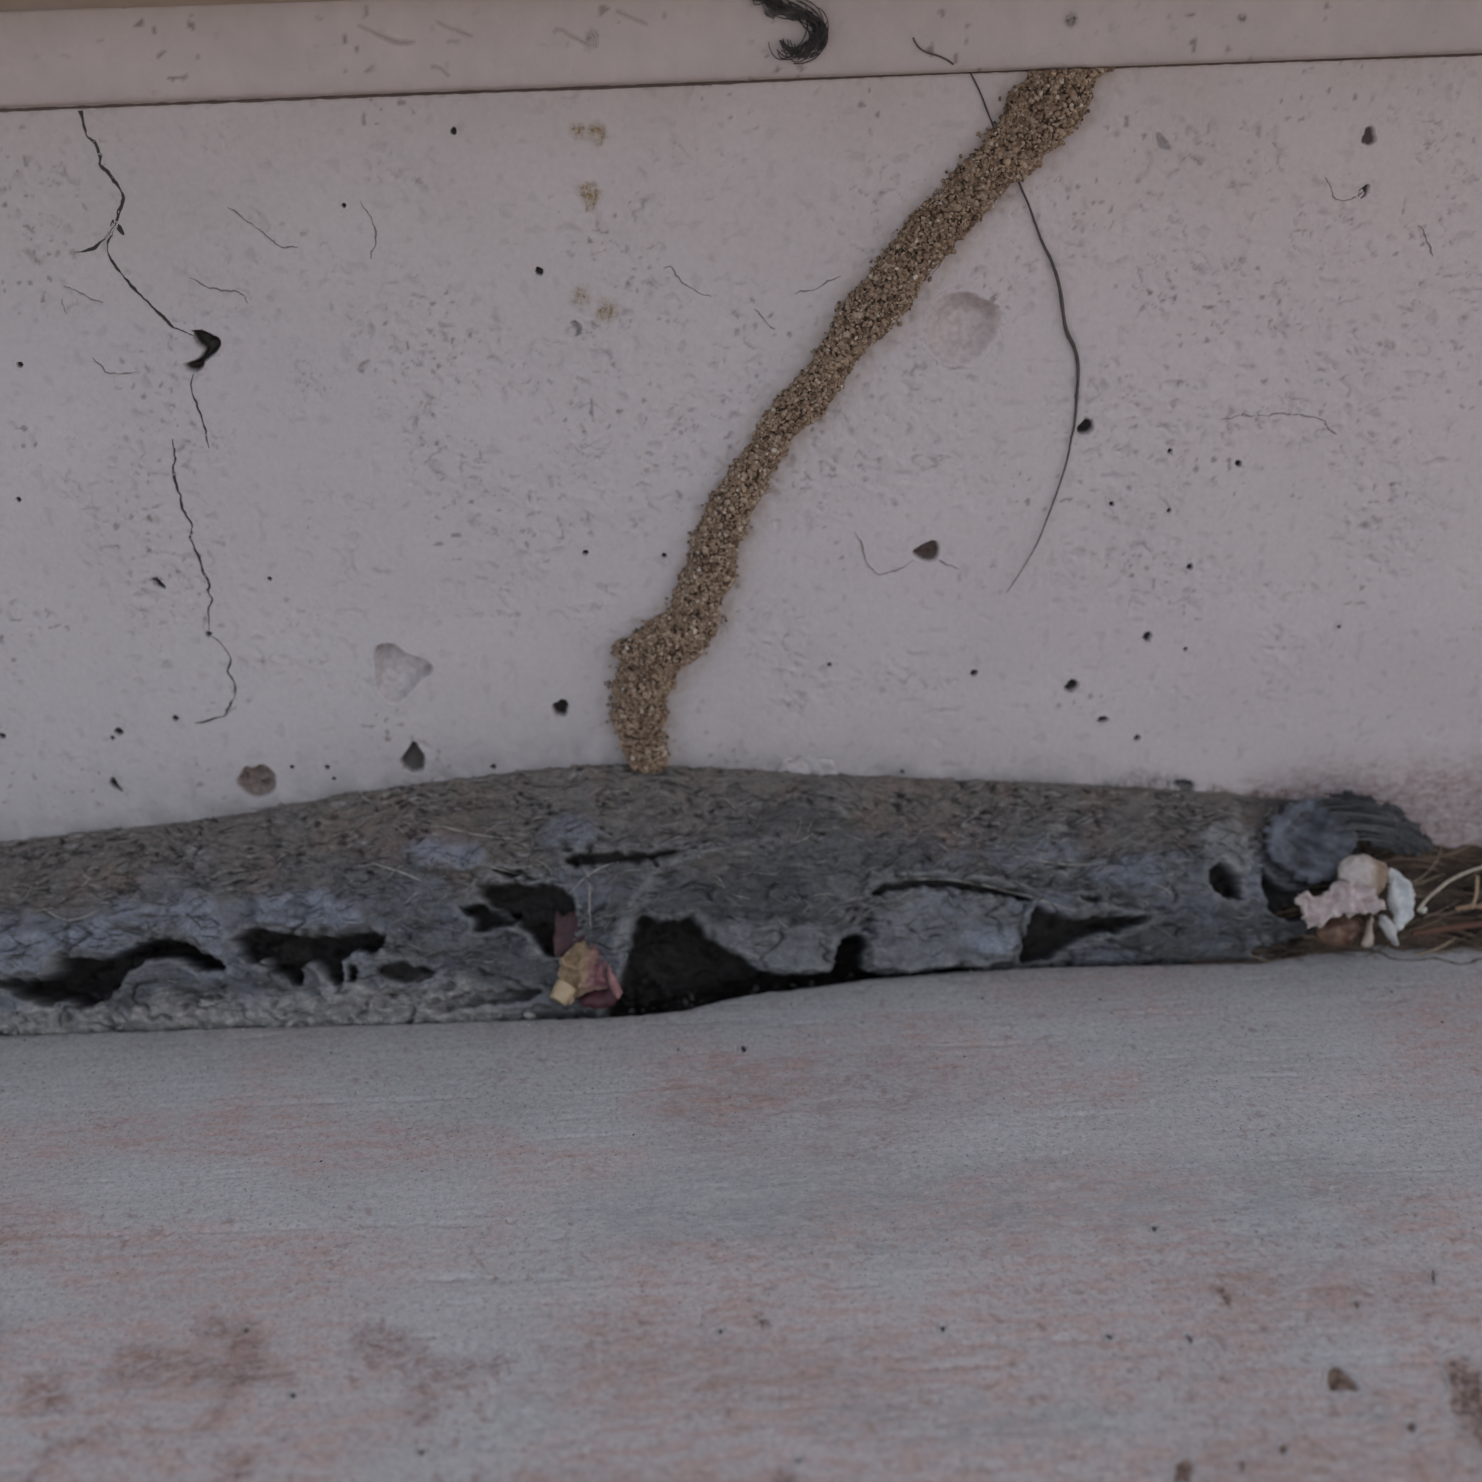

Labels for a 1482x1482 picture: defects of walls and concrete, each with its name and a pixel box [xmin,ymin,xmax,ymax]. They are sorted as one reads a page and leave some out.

crack [60,109,194,338]
crack [190,276,250,303]
crack [92,356,137,376]
crack [170,373,239,725]
peeling [1386,868,1427,931]